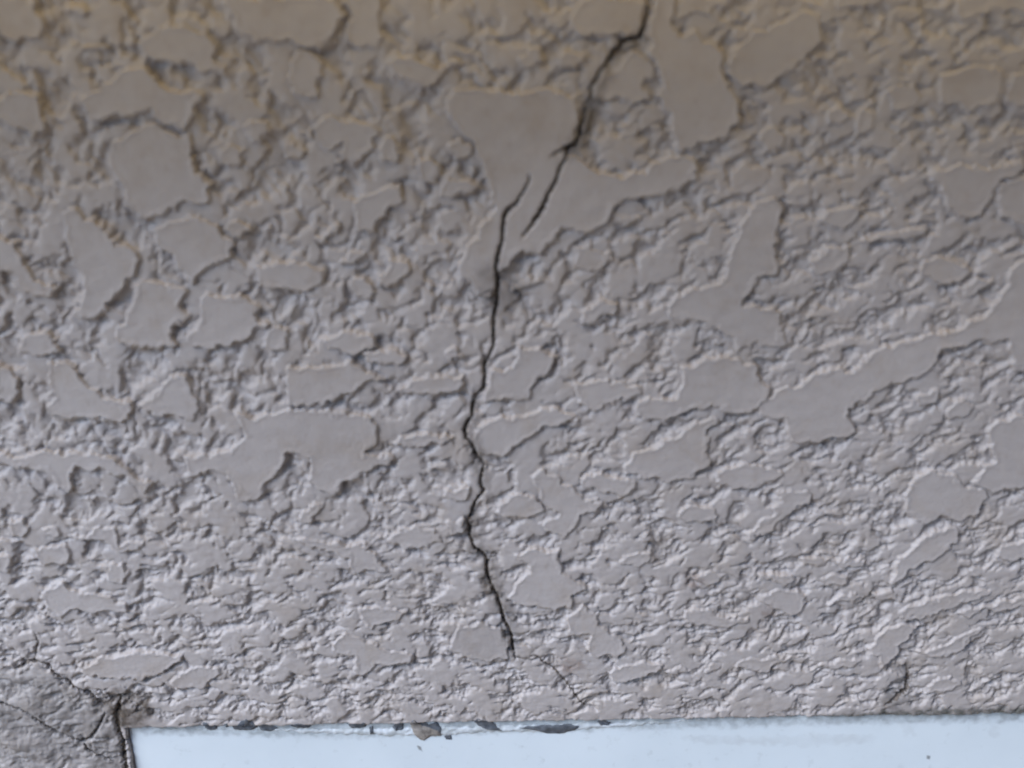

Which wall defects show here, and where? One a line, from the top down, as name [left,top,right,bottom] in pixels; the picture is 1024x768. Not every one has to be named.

crack [462,0,650,705]